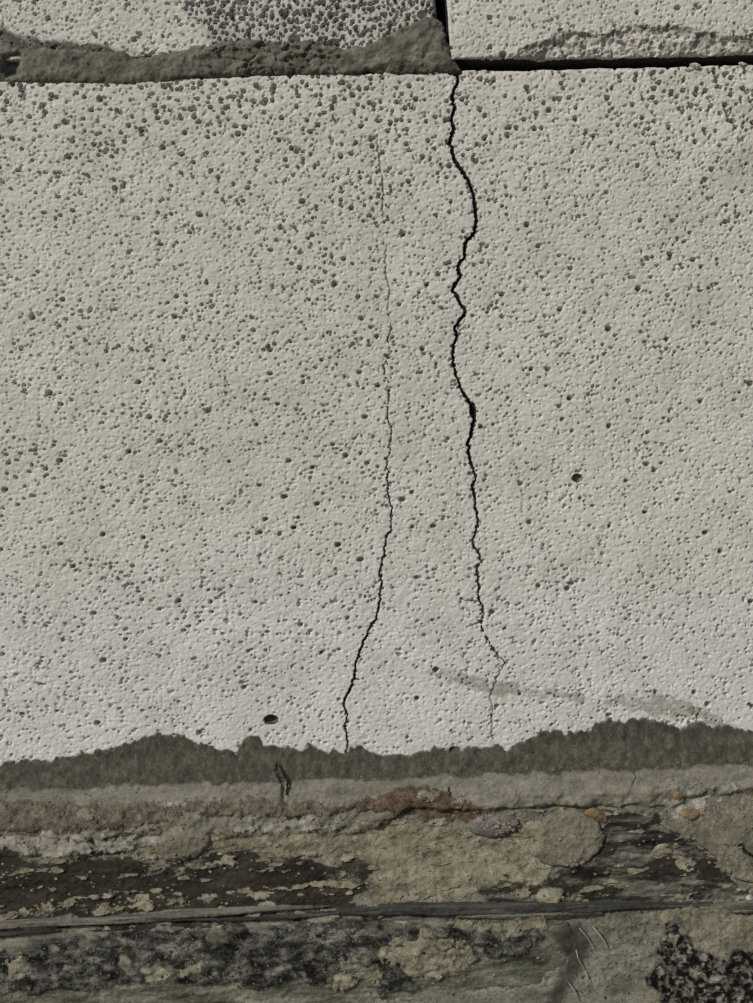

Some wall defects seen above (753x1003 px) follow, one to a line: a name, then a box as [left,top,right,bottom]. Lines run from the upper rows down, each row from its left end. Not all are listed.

crack [376,139,384,216]
crack [448,75,505,736]
crack [343,246,393,753]
damp [0,717,753,862]
corrosion [363,784,492,823]
damp [0,846,97,895]
damp [57,912,274,932]
damp [198,852,356,908]
damp [560,883,649,912]
damp [629,833,724,891]